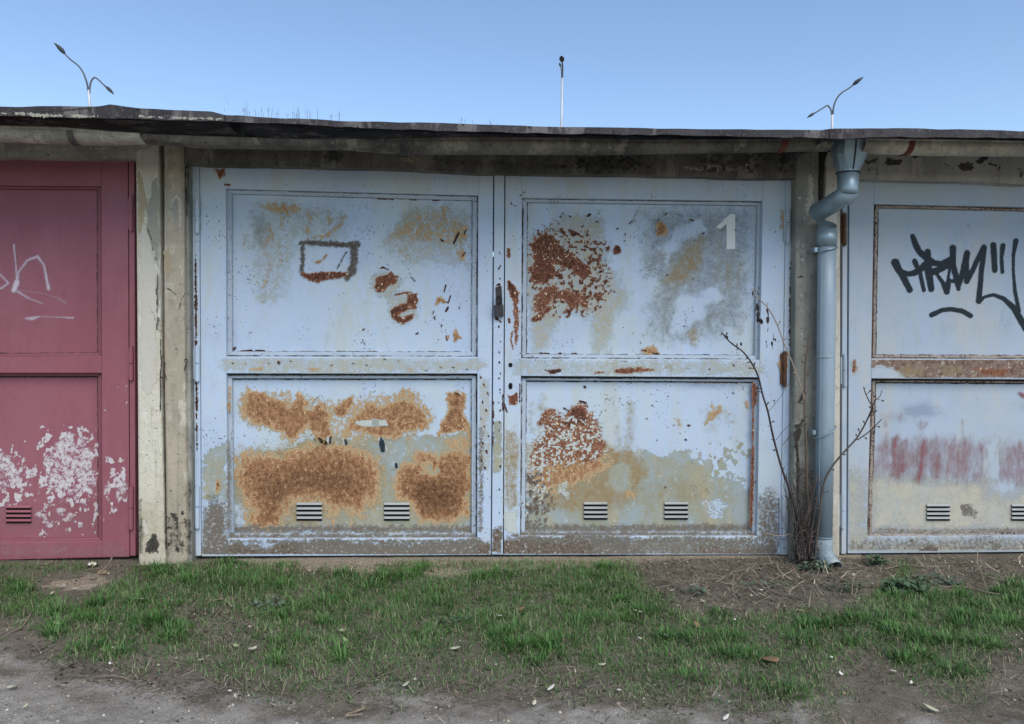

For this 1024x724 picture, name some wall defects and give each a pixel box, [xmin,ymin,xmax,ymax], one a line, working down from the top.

corrosion [372,266,419,325]
corrosion [507,212,633,355]
peeling [0,418,128,520]
corrosion [215,385,472,533]
corrosion [504,384,647,535]
corrosion [705,403,730,425]
corrosion [745,382,758,527]
corrosion [868,219,1024,535]